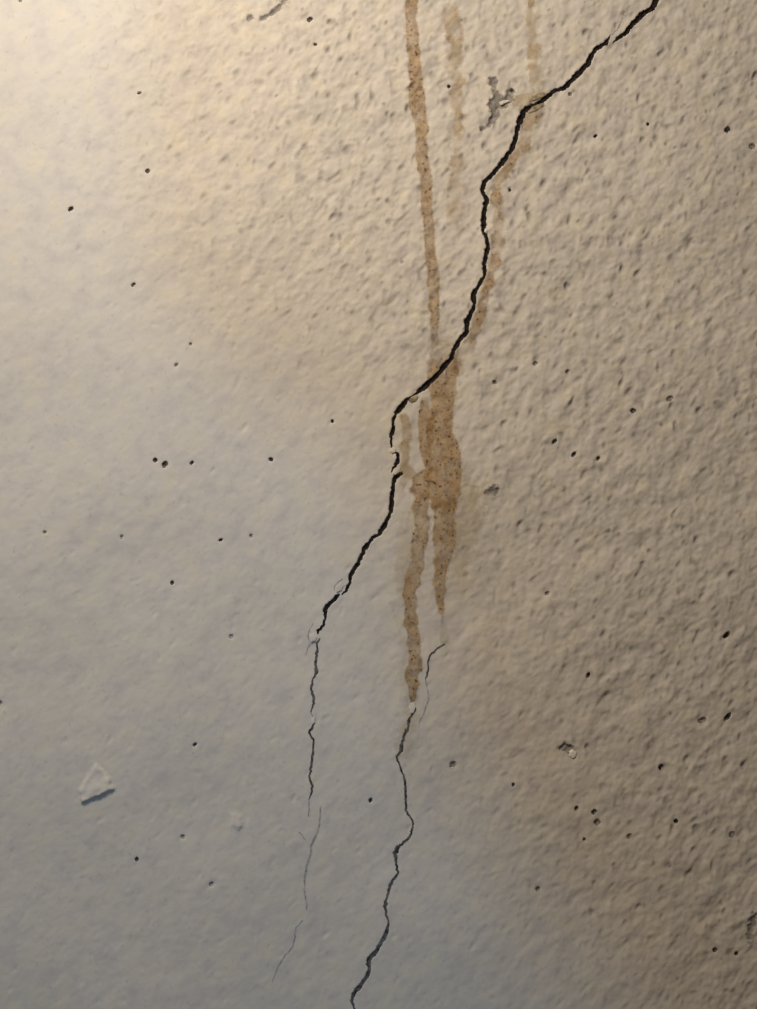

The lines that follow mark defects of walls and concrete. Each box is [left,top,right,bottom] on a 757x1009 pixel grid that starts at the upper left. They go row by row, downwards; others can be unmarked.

rust [406,0,439,328]
rust [401,362,461,701]
crack [272,0,659,1009]